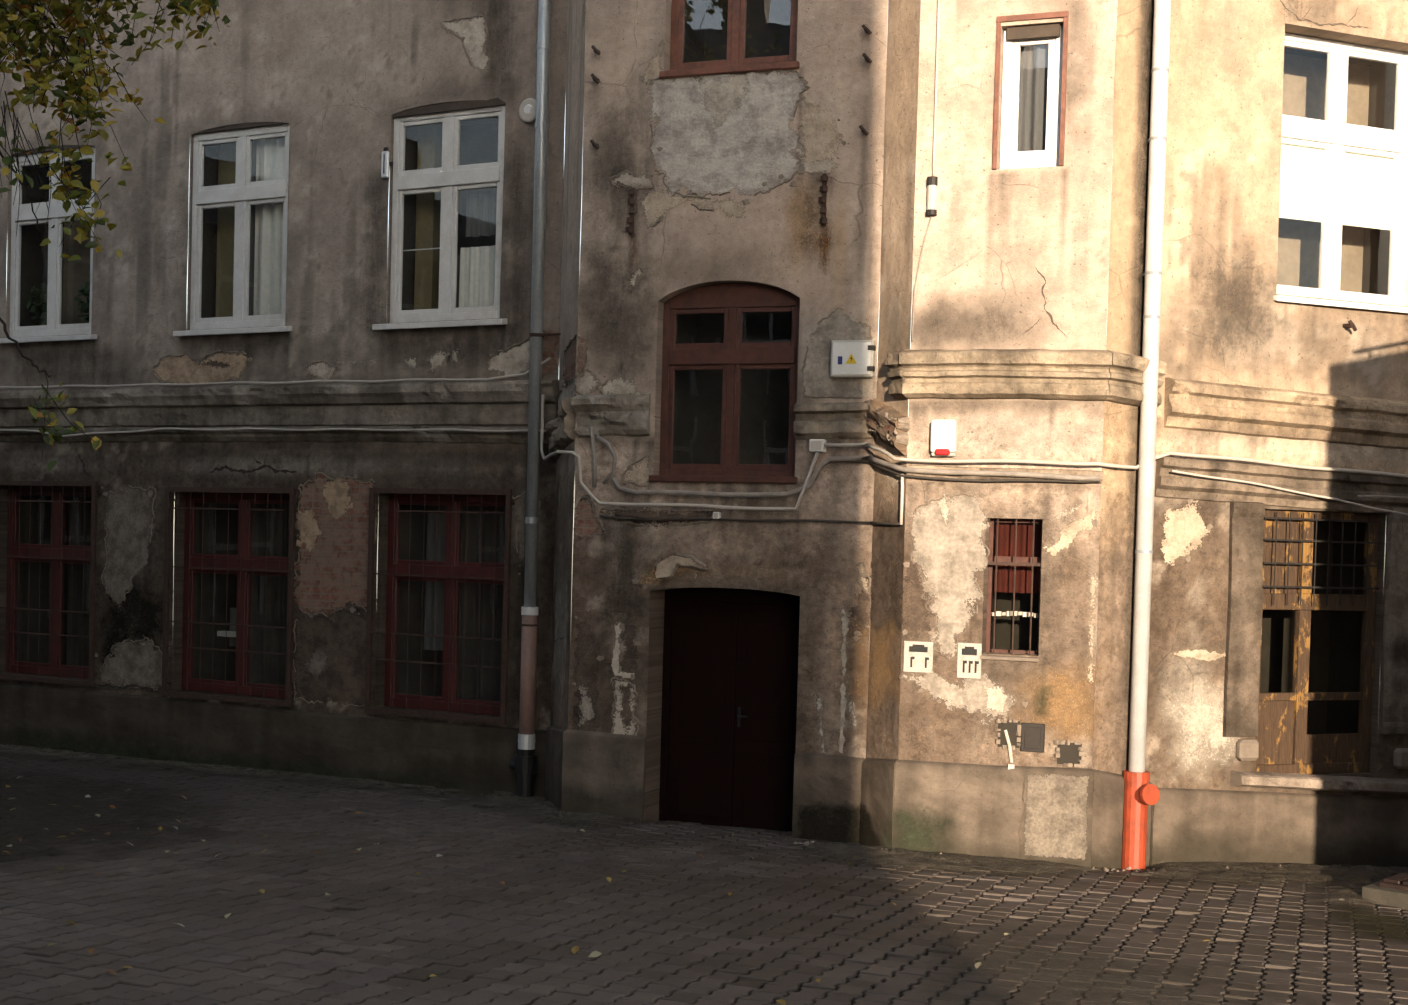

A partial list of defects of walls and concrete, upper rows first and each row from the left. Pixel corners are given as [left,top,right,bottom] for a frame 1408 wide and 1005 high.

peeling [442,15,490,71]
crack [1280,0,1372,29]
peeling [607,40,846,229]
spalling [145,350,252,386]
spalling [486,330,642,409]
peeling [101,484,157,612]
peeling [94,635,169,690]
spalling [293,472,377,708]
peeling [631,553,709,589]
peeling [817,493,1089,861]
peeling [1043,505,1101,556]
peeling [1086,572,1098,682]